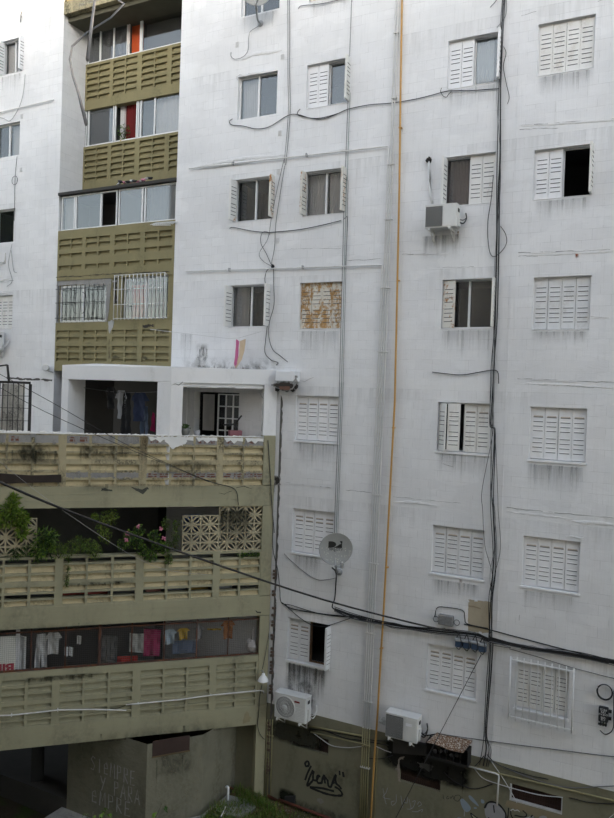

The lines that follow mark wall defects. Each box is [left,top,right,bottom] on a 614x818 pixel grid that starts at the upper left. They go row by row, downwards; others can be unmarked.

damp [17,447,56,461]
damp [288,663,324,695]